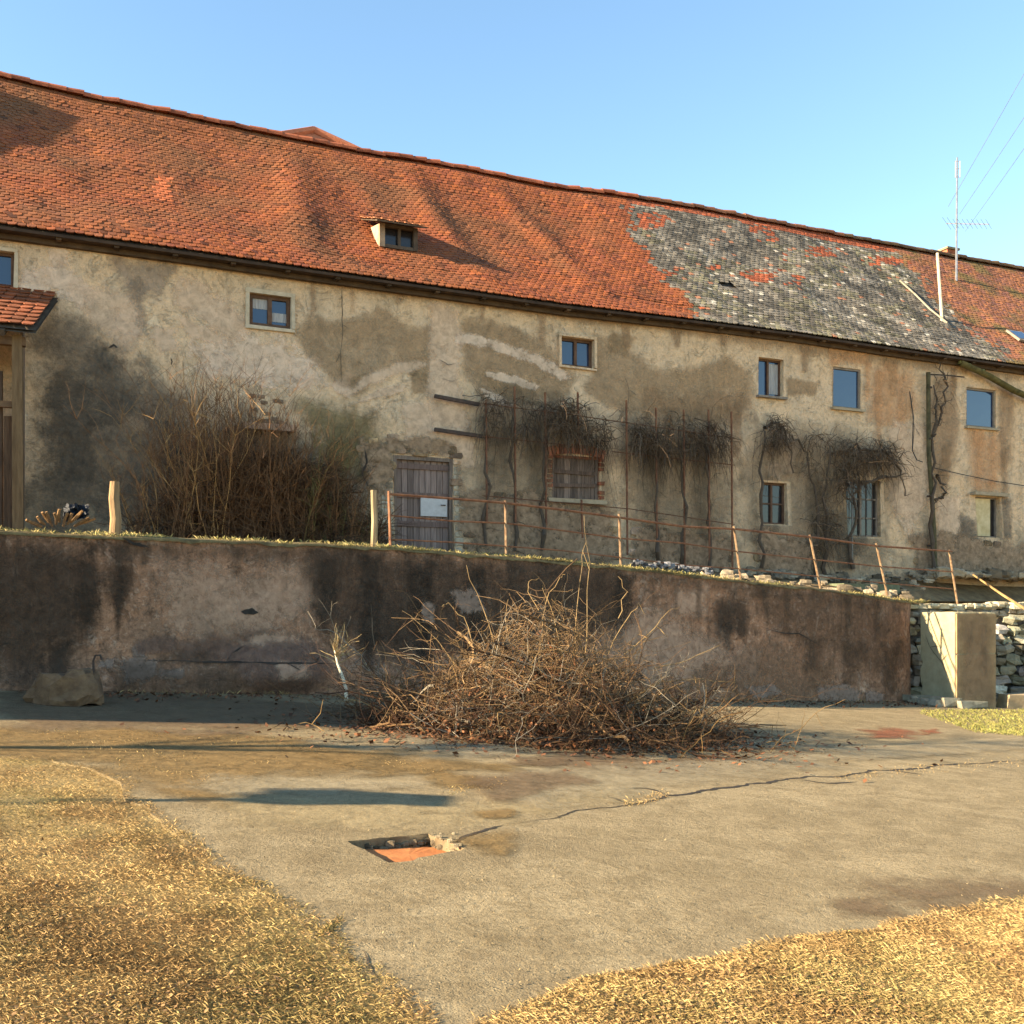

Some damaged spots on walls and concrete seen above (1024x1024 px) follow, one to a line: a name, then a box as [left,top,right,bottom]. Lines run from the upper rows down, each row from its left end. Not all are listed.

leakage [788,379,817,395]
leakage [0,258,781,741]
efflorescence [817,684,883,701]
leakage [471,753,797,800]
crack [453,761,1005,843]
hole [348,832,471,863]